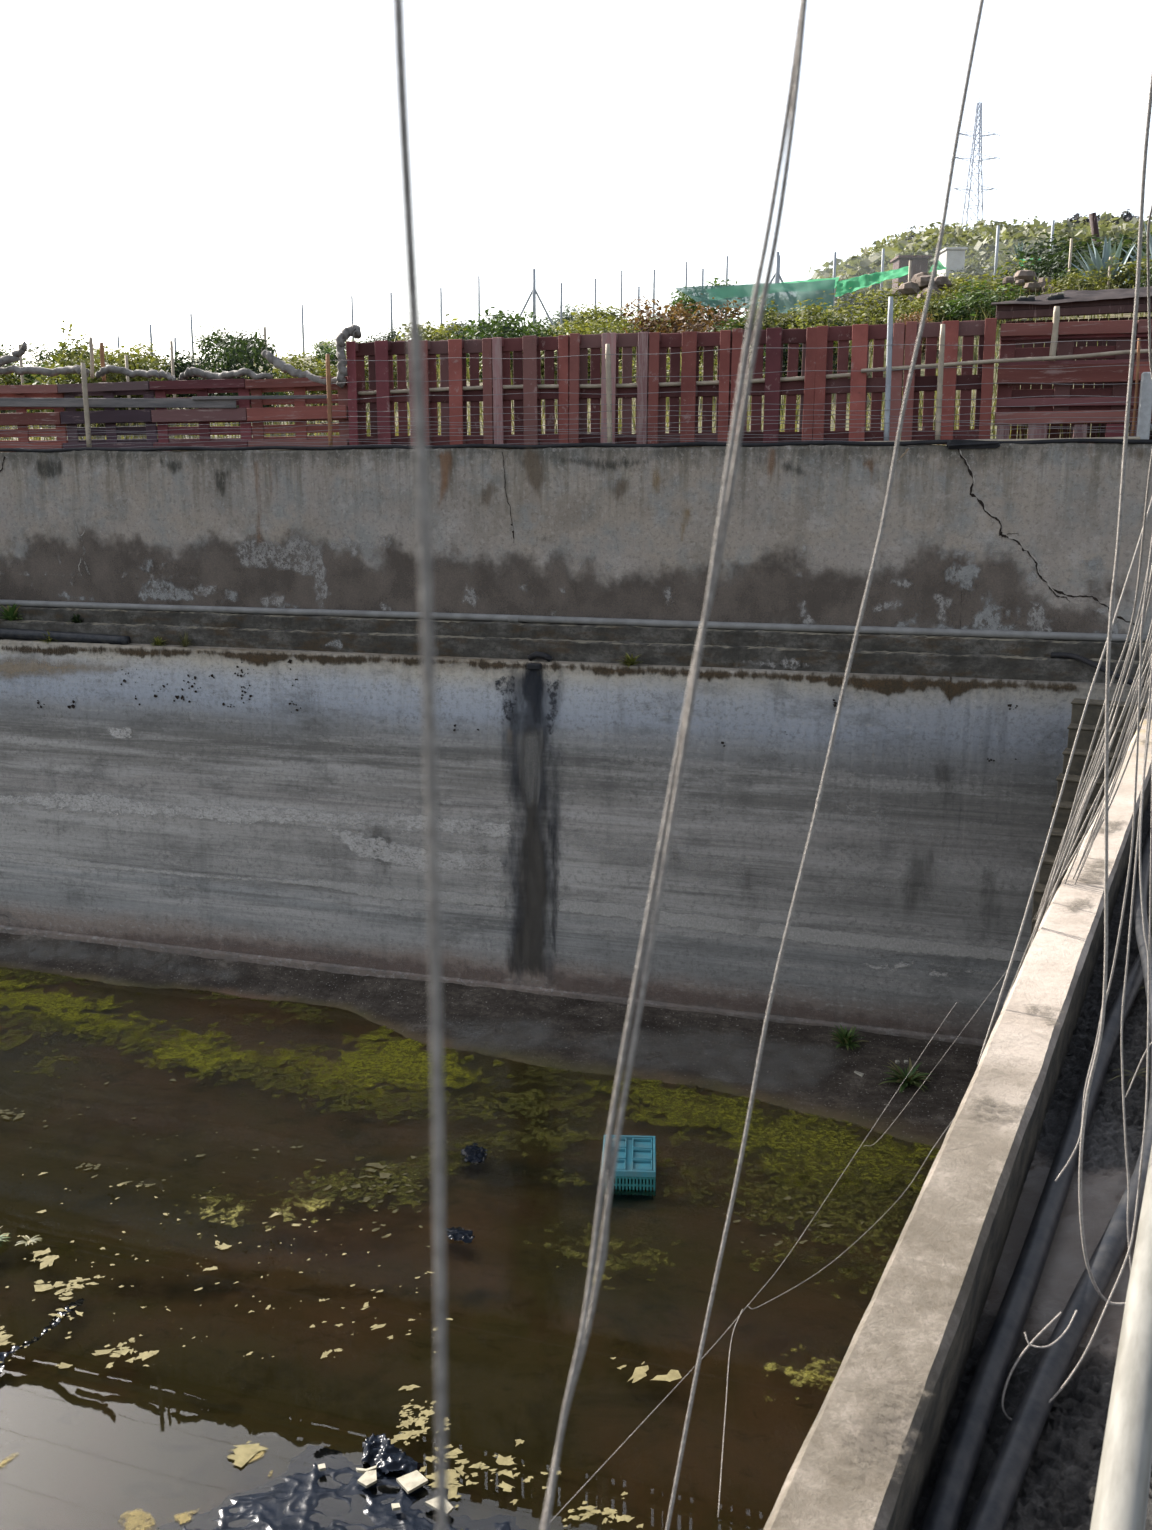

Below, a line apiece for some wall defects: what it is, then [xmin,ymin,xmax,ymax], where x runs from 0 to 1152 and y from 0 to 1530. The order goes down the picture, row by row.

damp [0,531,1116,634]
crack [946,446,1135,625]
damp [0,669,1027,982]
damp [559,978,901,1026]